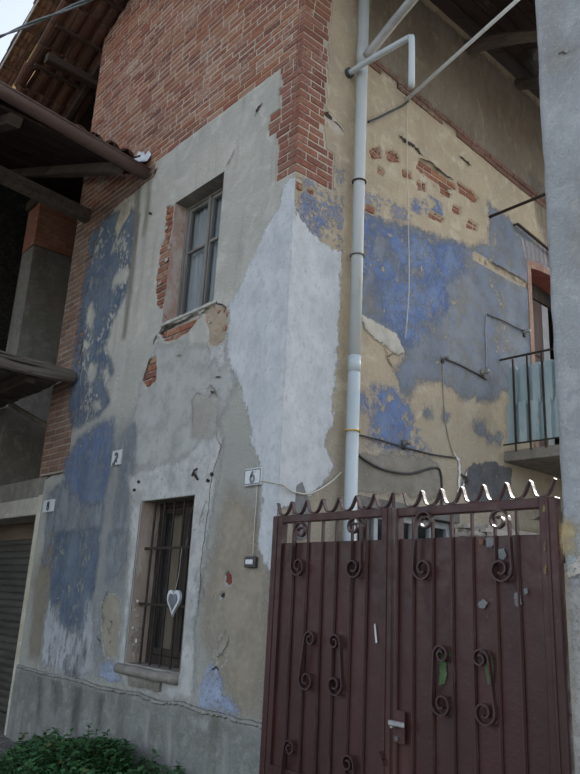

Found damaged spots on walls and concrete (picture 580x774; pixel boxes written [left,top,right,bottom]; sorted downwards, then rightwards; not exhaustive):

peeling [360,147,550,457]
peeling [42,206,238,715]
crack [195,415,222,622]
peeling [461,461,512,502]